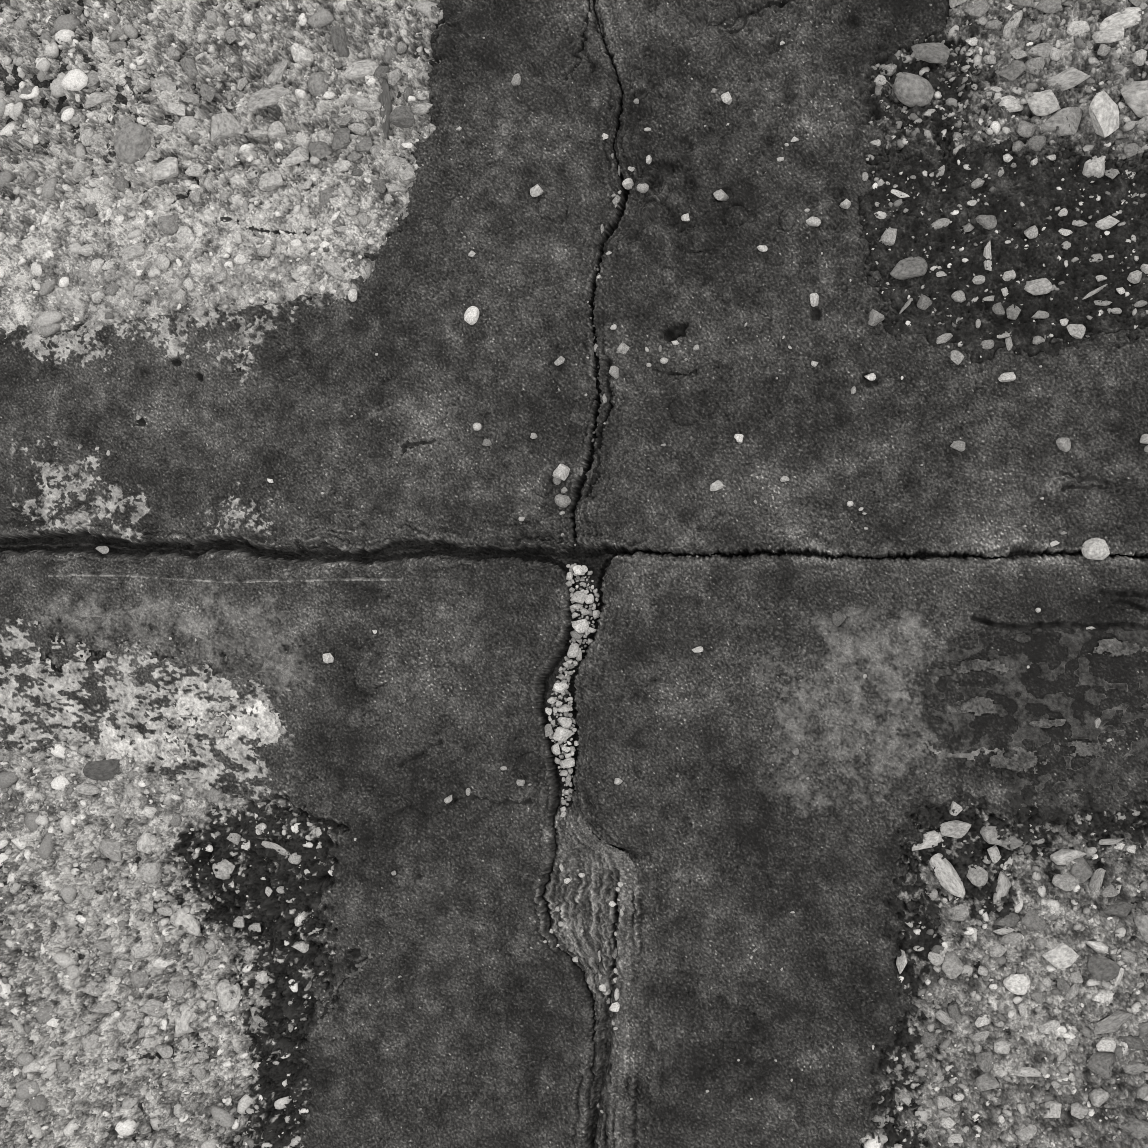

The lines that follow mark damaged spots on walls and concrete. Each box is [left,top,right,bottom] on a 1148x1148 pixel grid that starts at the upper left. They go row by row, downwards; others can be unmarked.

crack [564,0,596,80]
crack [170,168,221,211]
spalling [0,0,445,339]
crack [220,216,317,236]
spalling [857,0,1148,372]
crack [400,438,437,455]
crack [586,359,614,498]
crack [48,573,402,583]
crack [971,590,1148,632]
spalling [859,624,1148,1148]
spalling [0,739,373,1148]
crack [136,1039,213,1059]